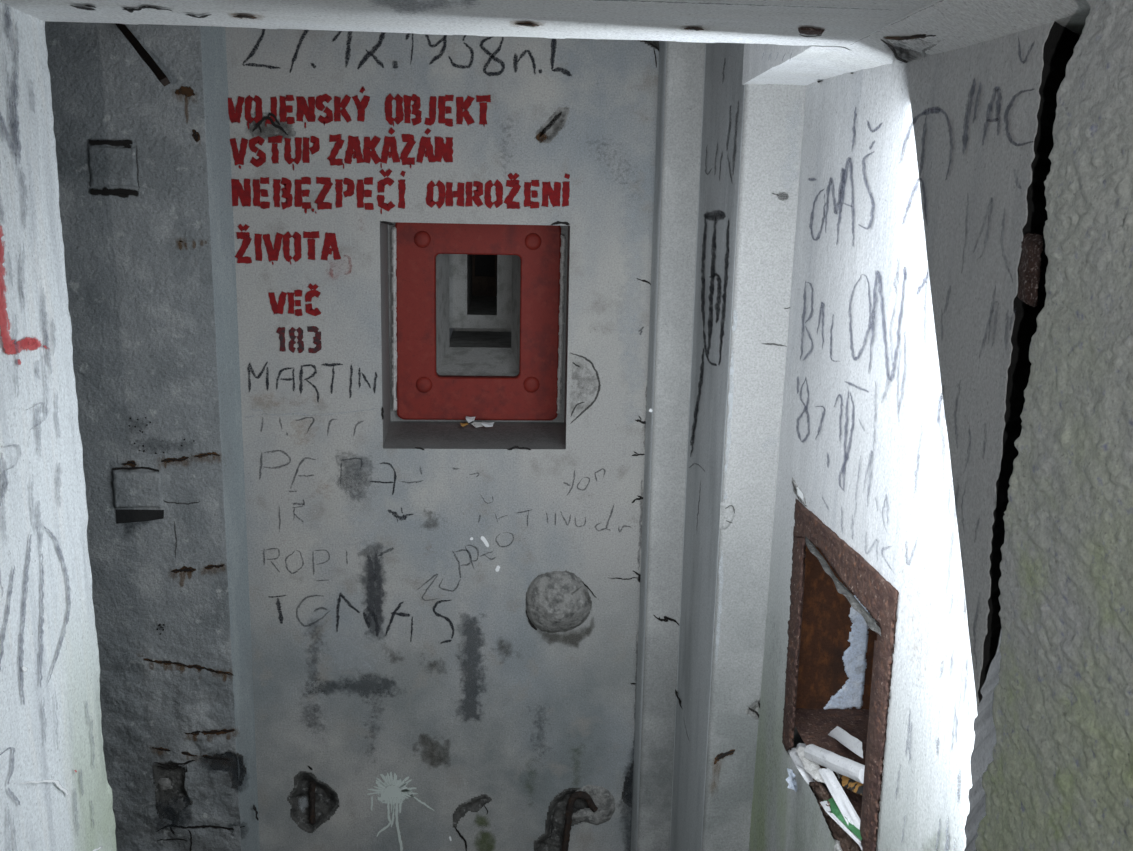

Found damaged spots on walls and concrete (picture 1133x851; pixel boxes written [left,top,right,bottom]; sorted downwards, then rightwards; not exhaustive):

spalling [881,34,937,63]
corrosion [161,452,220,468]
corrosion [171,564,225,587]
corrosion [143,658,234,681]
spalling [204,752,247,790]
spalling [153,761,193,829]